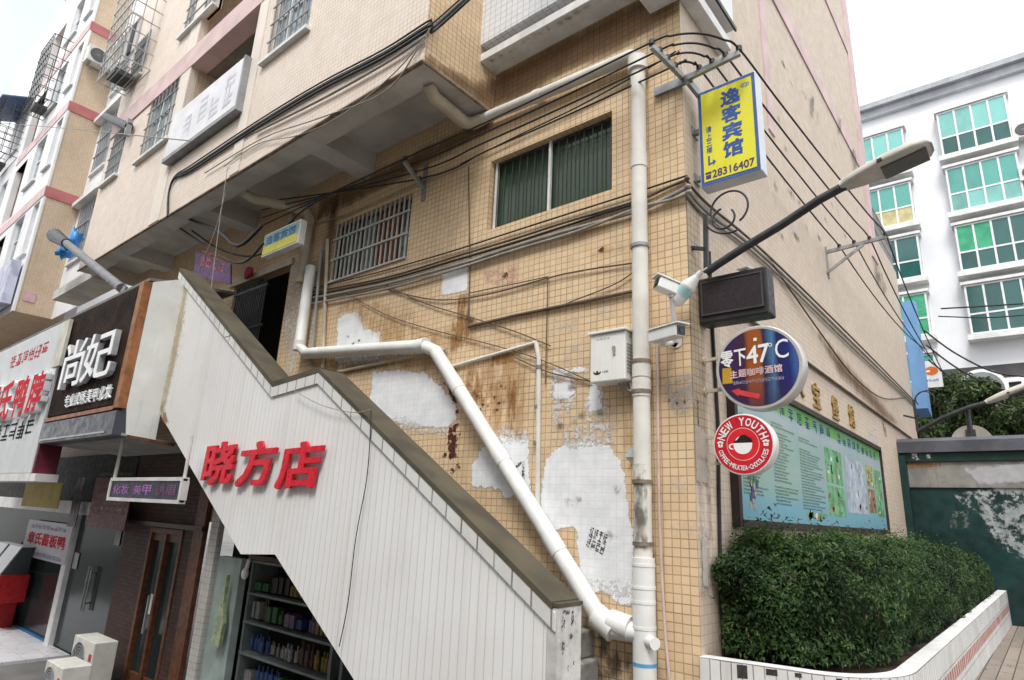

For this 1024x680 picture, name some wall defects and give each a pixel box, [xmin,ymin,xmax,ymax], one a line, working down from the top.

corrosion [451,295,473,350]
corrosion [492,353,513,365]
corrosion [466,373,516,416]
peeling [955,488,1024,558]